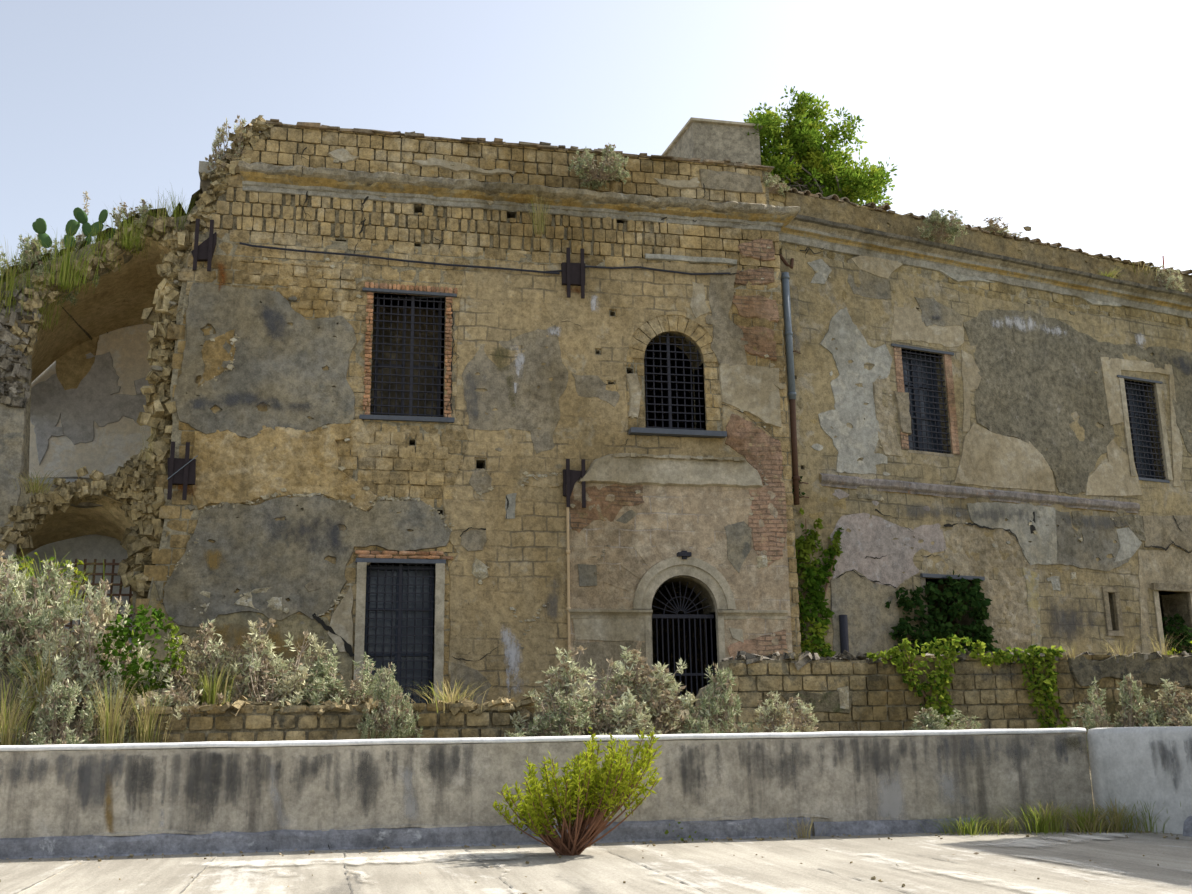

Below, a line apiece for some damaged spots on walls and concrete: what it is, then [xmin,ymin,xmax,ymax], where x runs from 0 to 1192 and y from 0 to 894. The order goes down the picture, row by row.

spalling [30,115,494,616]
spalling [873,376,912,457]
spalling [505,471,645,533]
crack [944,523,1024,551]
crack [1144,516,1192,553]
crack [833,556,896,588]
damp [31,753,240,805]